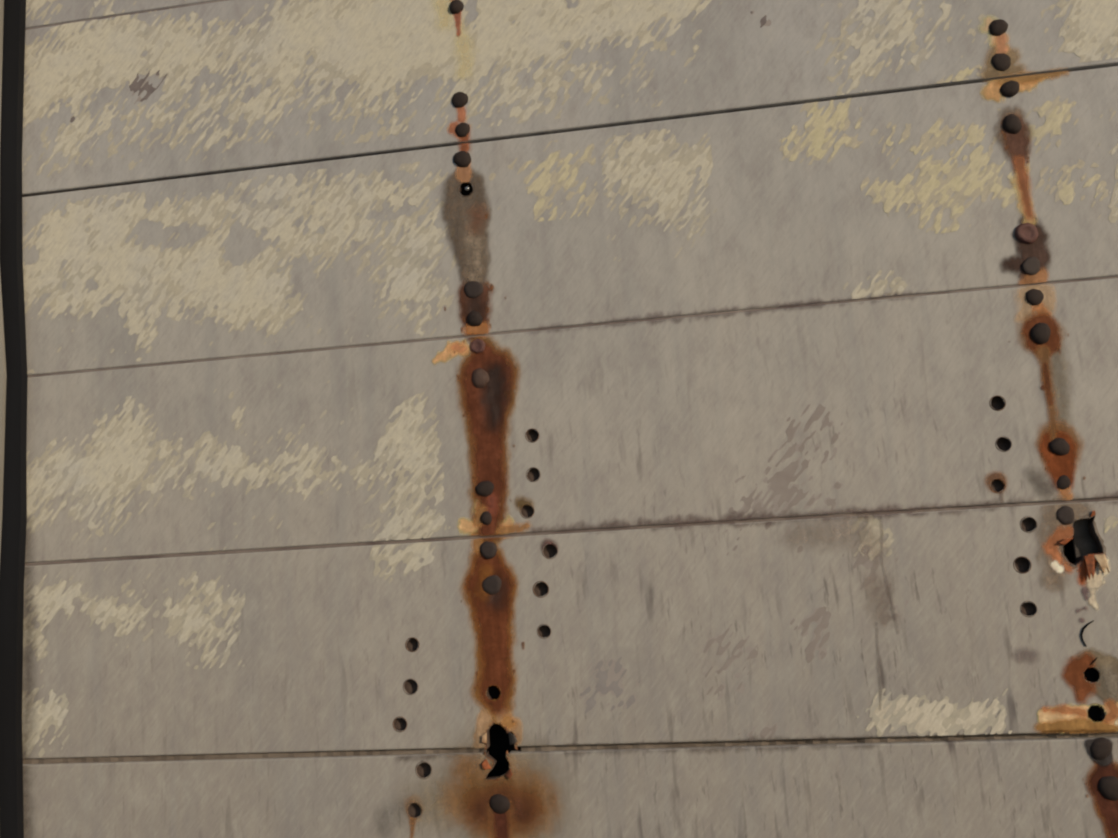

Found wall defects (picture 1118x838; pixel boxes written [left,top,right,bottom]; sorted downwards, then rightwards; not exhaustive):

peeling [22,0,722,177]
rust [441,0,461,36]
peeling [23,162,457,362]
damp [443,164,489,283]
rust [981,17,1110,622]
peeling [26,388,450,583]
rust [406,281,548,838]
peeling [22,560,245,757]
peeling [857,688,1012,737]
peeling [1036,701,1118,733]
rust [1063,650,1118,703]
rust [1085,739,1118,838]